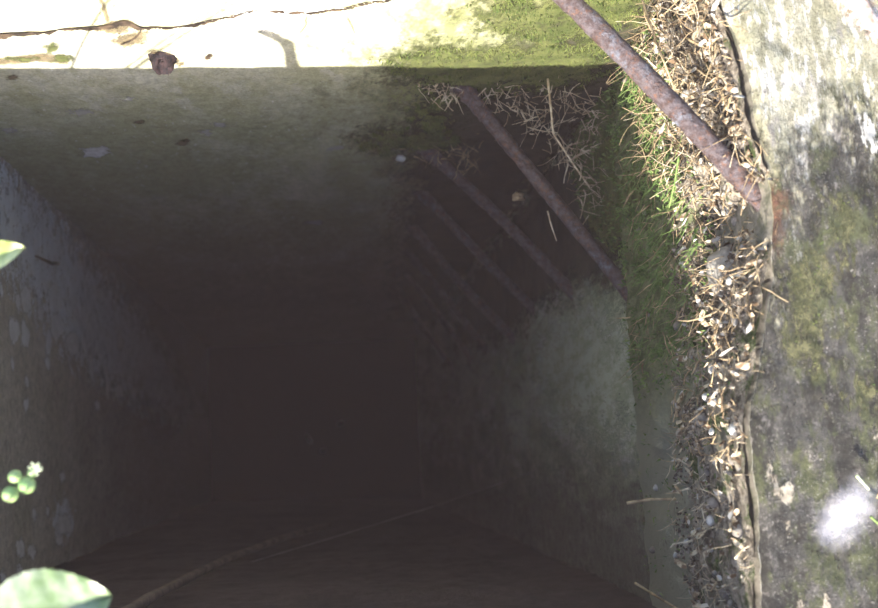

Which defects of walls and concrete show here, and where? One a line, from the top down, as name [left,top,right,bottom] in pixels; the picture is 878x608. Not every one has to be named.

crack [0,0,395,49]